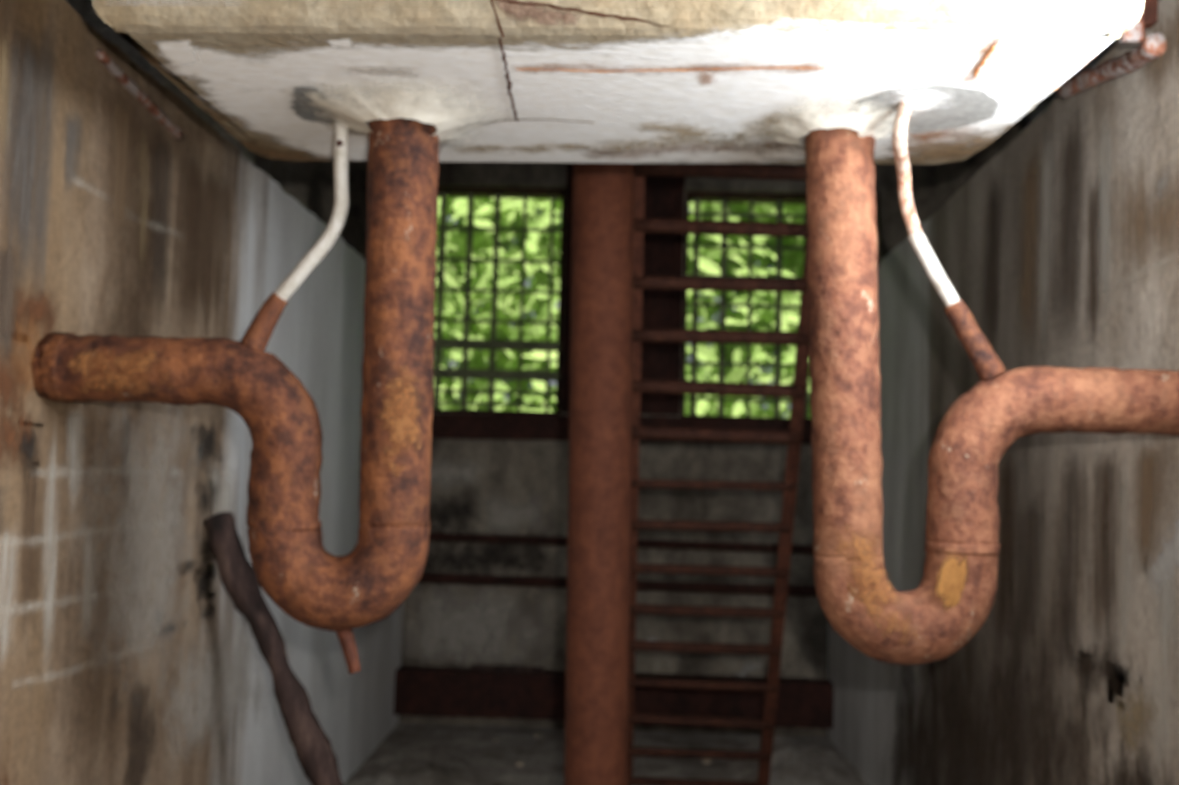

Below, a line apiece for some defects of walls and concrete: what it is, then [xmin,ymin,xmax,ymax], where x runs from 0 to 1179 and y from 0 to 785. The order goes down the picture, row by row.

crack [471,0,825,126]
water stain [153,139,170,287]
water stain [184,167,223,321]
water stain [426,499,553,573]
water stain [1096,463,1125,607]
water stain [1140,453,1179,580]
water stain [893,459,1111,785]
water stain [125,685,156,785]
water stain [1116,760,1152,785]